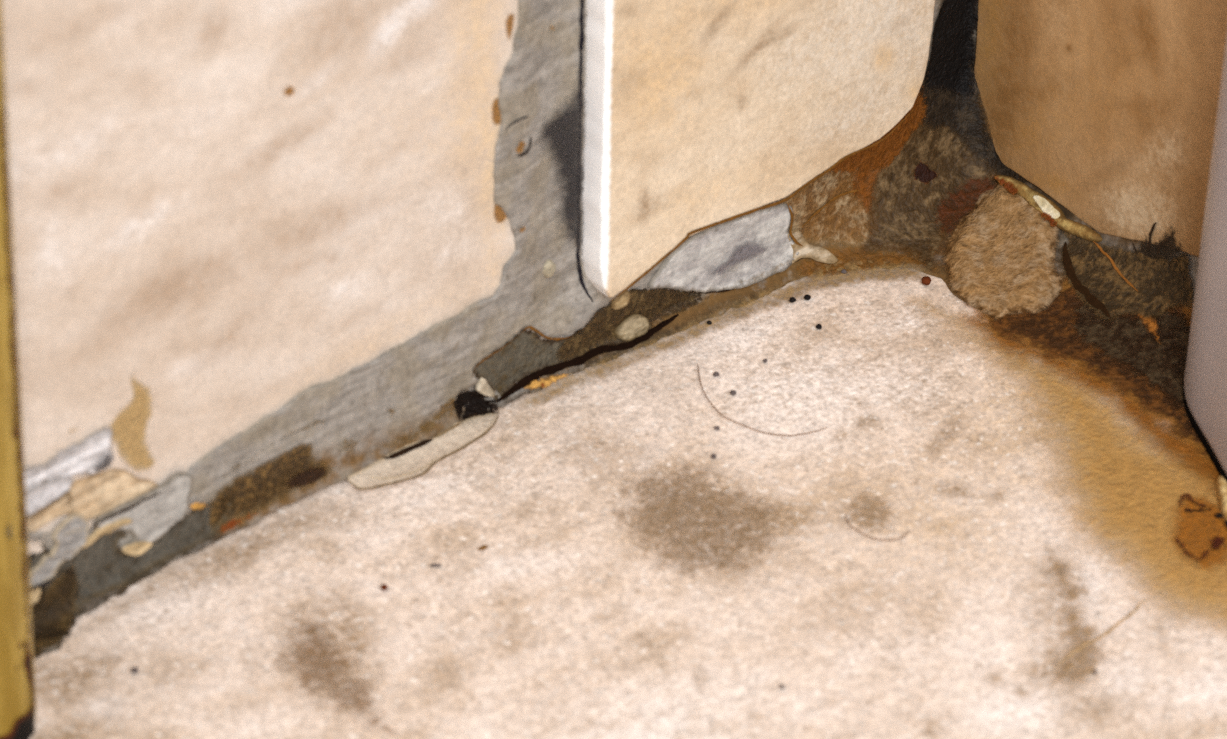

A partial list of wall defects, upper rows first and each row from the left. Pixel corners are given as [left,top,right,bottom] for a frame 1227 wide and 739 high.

crack [486,314,679,403]
leakage [533,64,1026,402]
rust [966,277,1210,460]
leakage [1063,223,1193,320]
spalling [19,427,232,653]
rust [1174,493,1227,568]